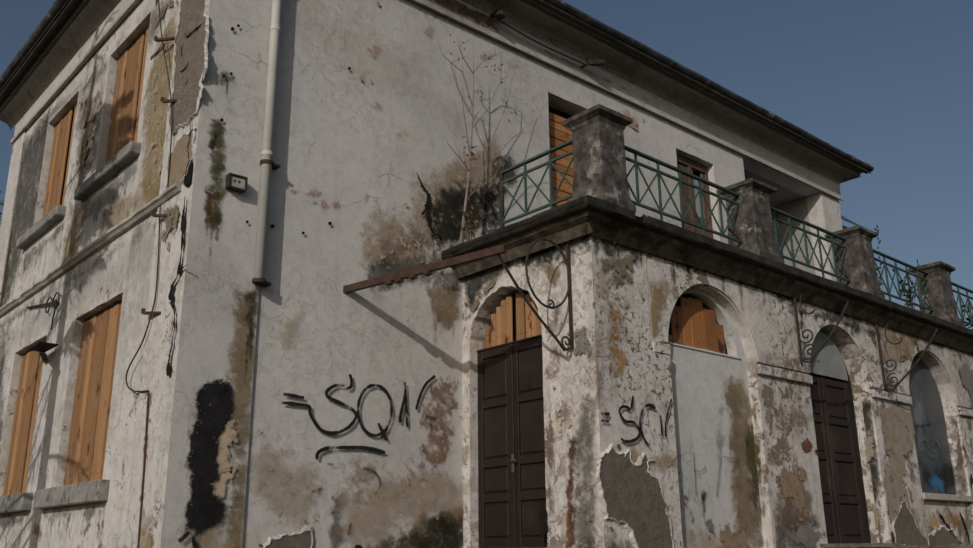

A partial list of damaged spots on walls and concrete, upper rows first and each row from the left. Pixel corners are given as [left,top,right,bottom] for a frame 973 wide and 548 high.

leakage [2,110,53,306]
spalling [139,0,209,250]
leakage [205,119,226,239]
leakage [364,138,643,375]
peeling [209,413,241,530]
leakage [196,291,257,548]
spalling [259,520,313,548]
spalling [595,444,674,548]
leakage [725,378,817,548]
spalling [801,433,818,453]
leakage [862,400,878,502]
spalling [862,371,965,545]